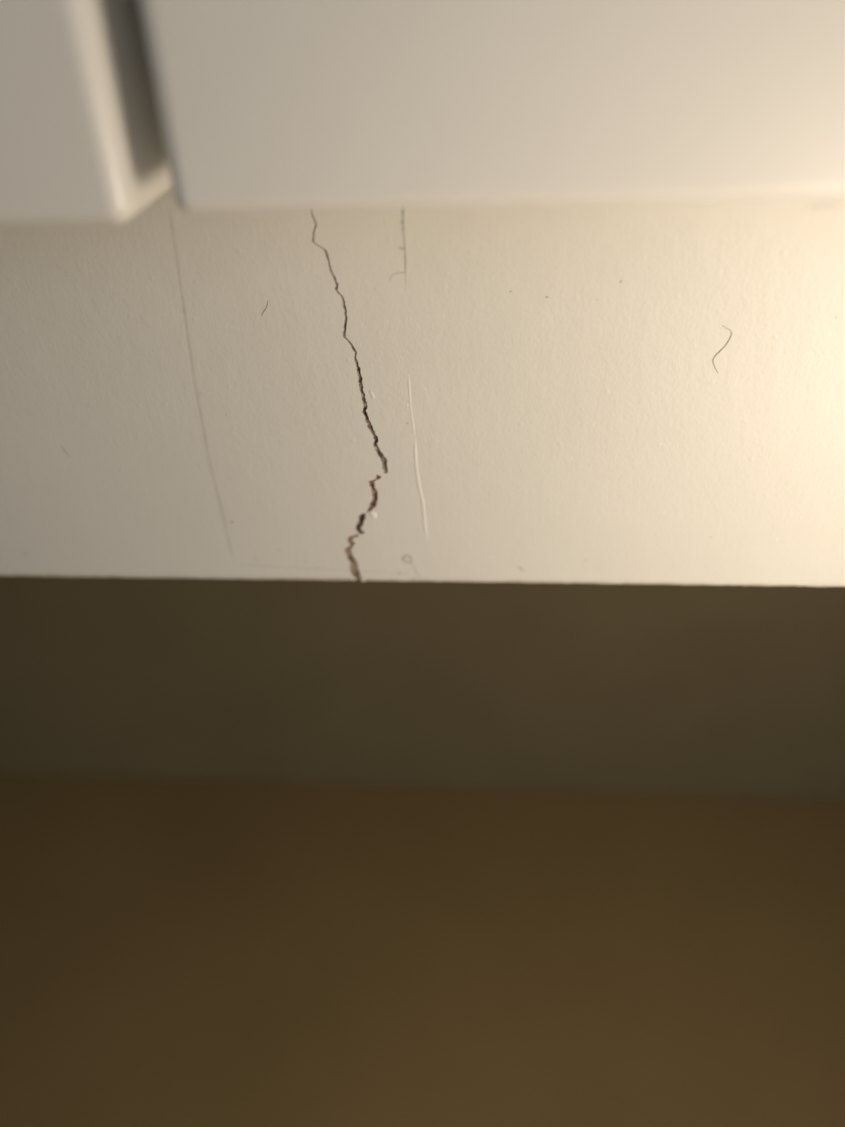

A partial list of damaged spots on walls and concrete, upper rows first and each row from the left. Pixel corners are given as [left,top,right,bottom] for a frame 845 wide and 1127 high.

crack [311,211,388,582]